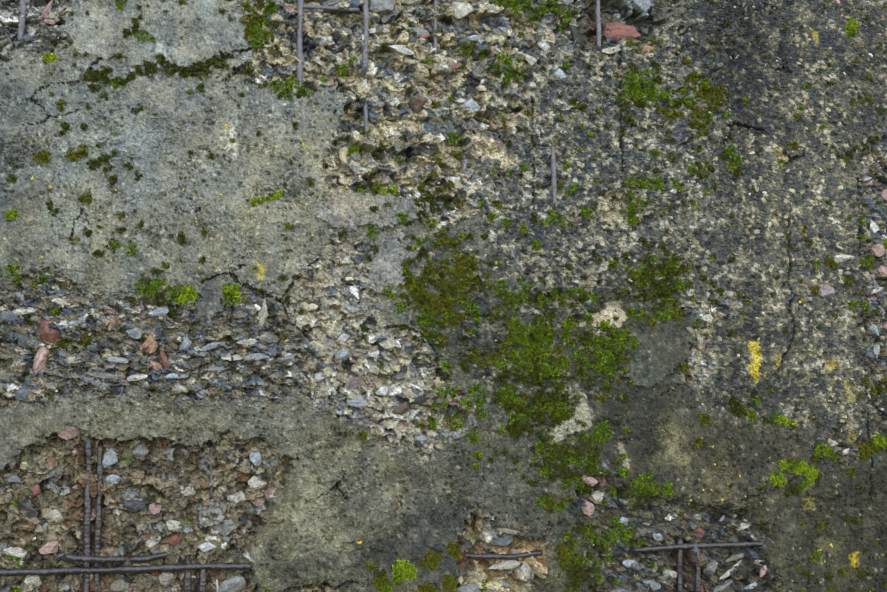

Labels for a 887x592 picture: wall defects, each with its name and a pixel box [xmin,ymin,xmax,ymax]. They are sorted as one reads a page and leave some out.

spalling [0,0,682,592]
rust [53,428,232,592]
peeling [651,421,694,475]
spalling [567,435,788,592]
rust [657,542,716,592]